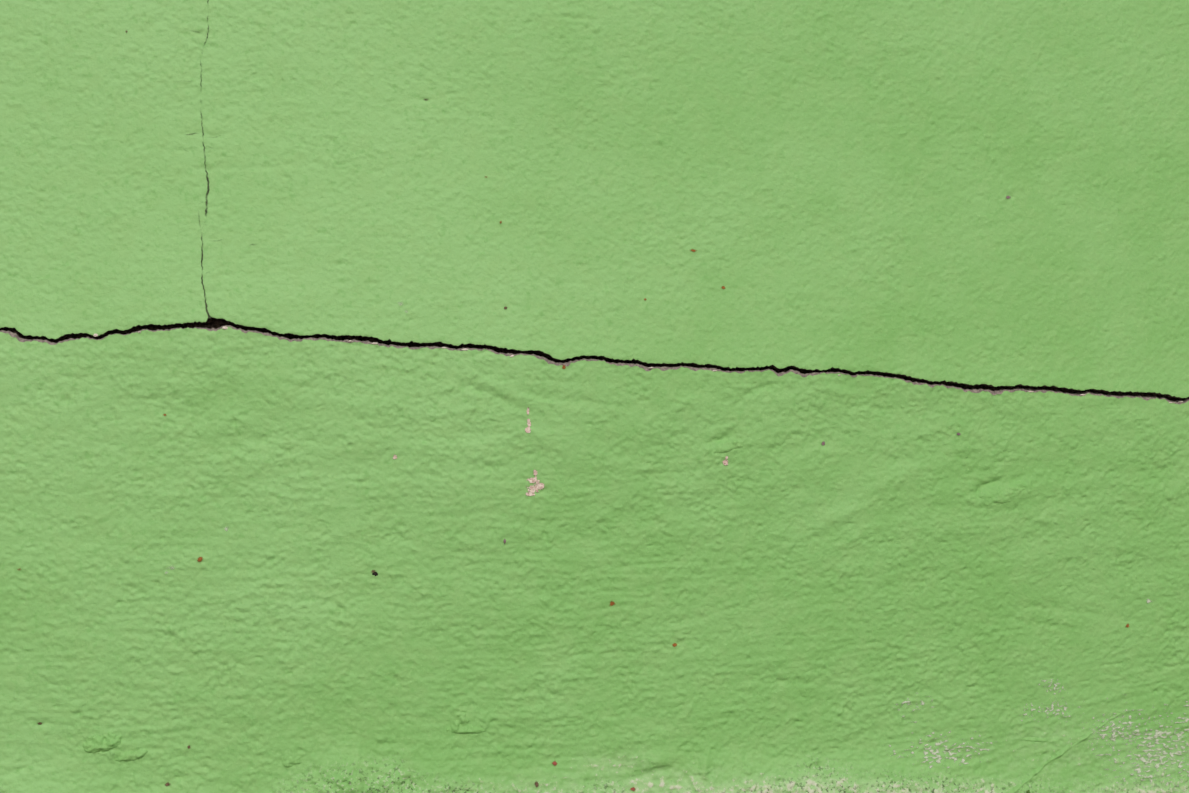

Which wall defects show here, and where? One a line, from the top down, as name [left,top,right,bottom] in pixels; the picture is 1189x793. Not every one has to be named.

crack [0,114,1189,404]
peeling [525,470,544,496]